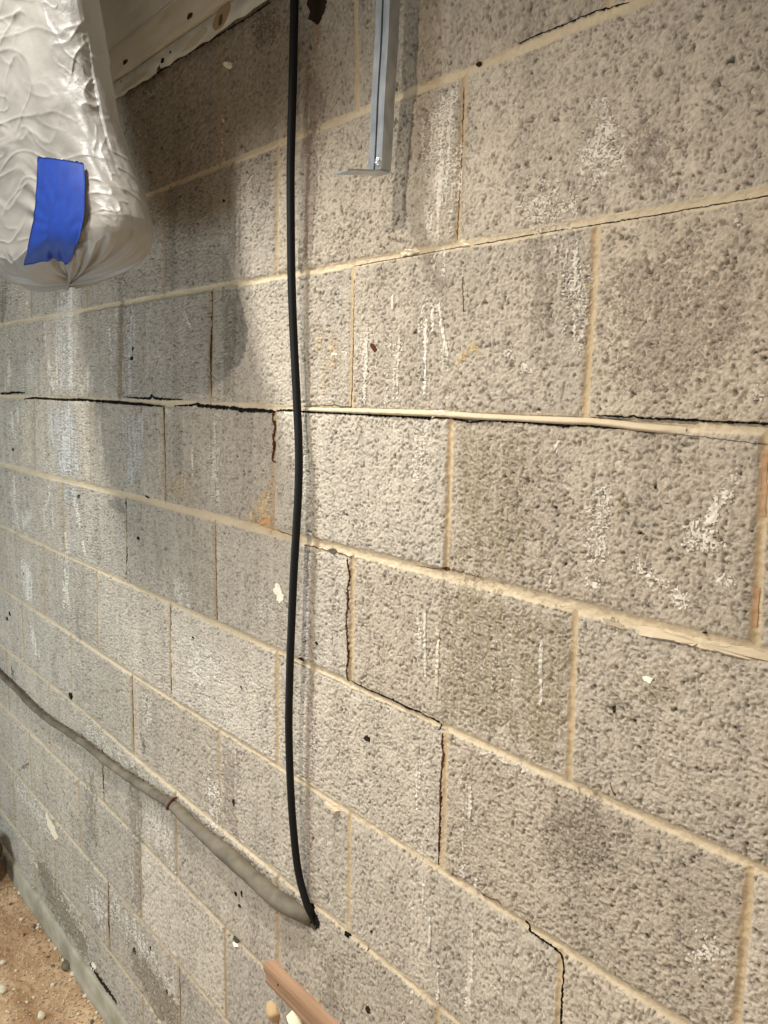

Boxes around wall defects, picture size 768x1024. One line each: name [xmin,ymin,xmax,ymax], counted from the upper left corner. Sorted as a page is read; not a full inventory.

crack [519,2,629,44]
crack [0,87,768,500]
crack [276,529,457,877]
crack [525,920,565,1024]